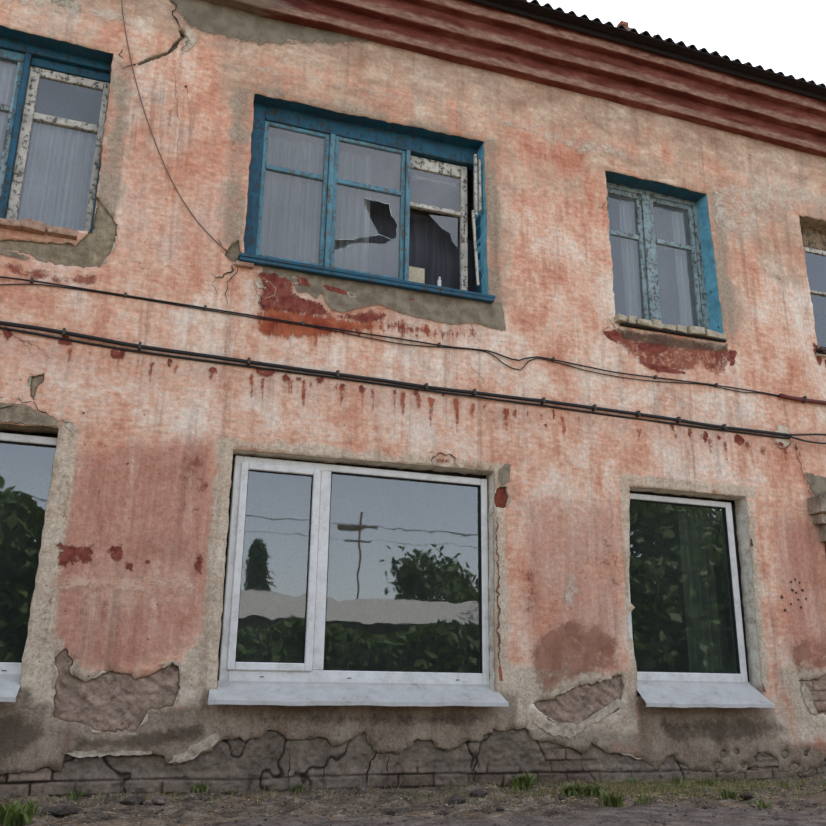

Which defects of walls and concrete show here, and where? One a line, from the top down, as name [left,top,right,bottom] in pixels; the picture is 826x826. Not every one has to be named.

crack [118,0,192,166]
flaking render [0,198,117,284]
peeling [254,272,385,323]
peeling [110,346,125,359]
peeling [603,329,737,374]
flaking render [0,375,58,427]
crack [0,397,75,424]
flaking render [52,648,180,735]
flaking render [533,675,623,725]
flaking render [799,674,826,715]
flaking render [64,750,152,758]
flaking render [168,734,219,763]